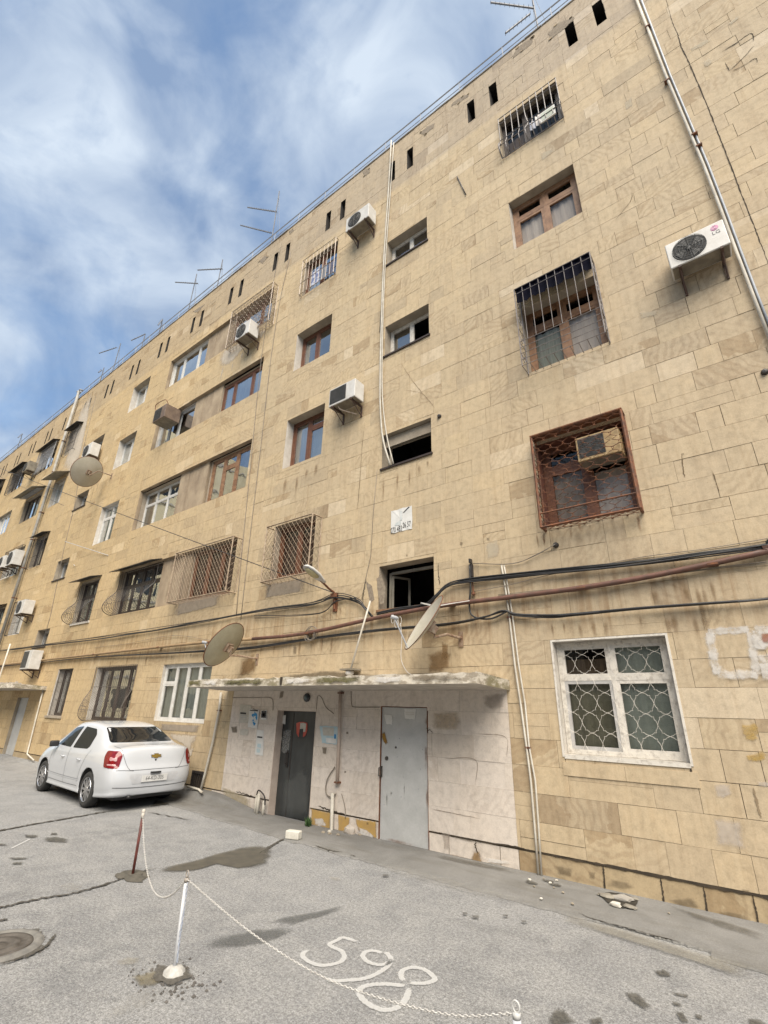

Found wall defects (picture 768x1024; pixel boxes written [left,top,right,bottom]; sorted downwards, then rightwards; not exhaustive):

crack [666,0,768,262]
flaking render [311,809,376,838]